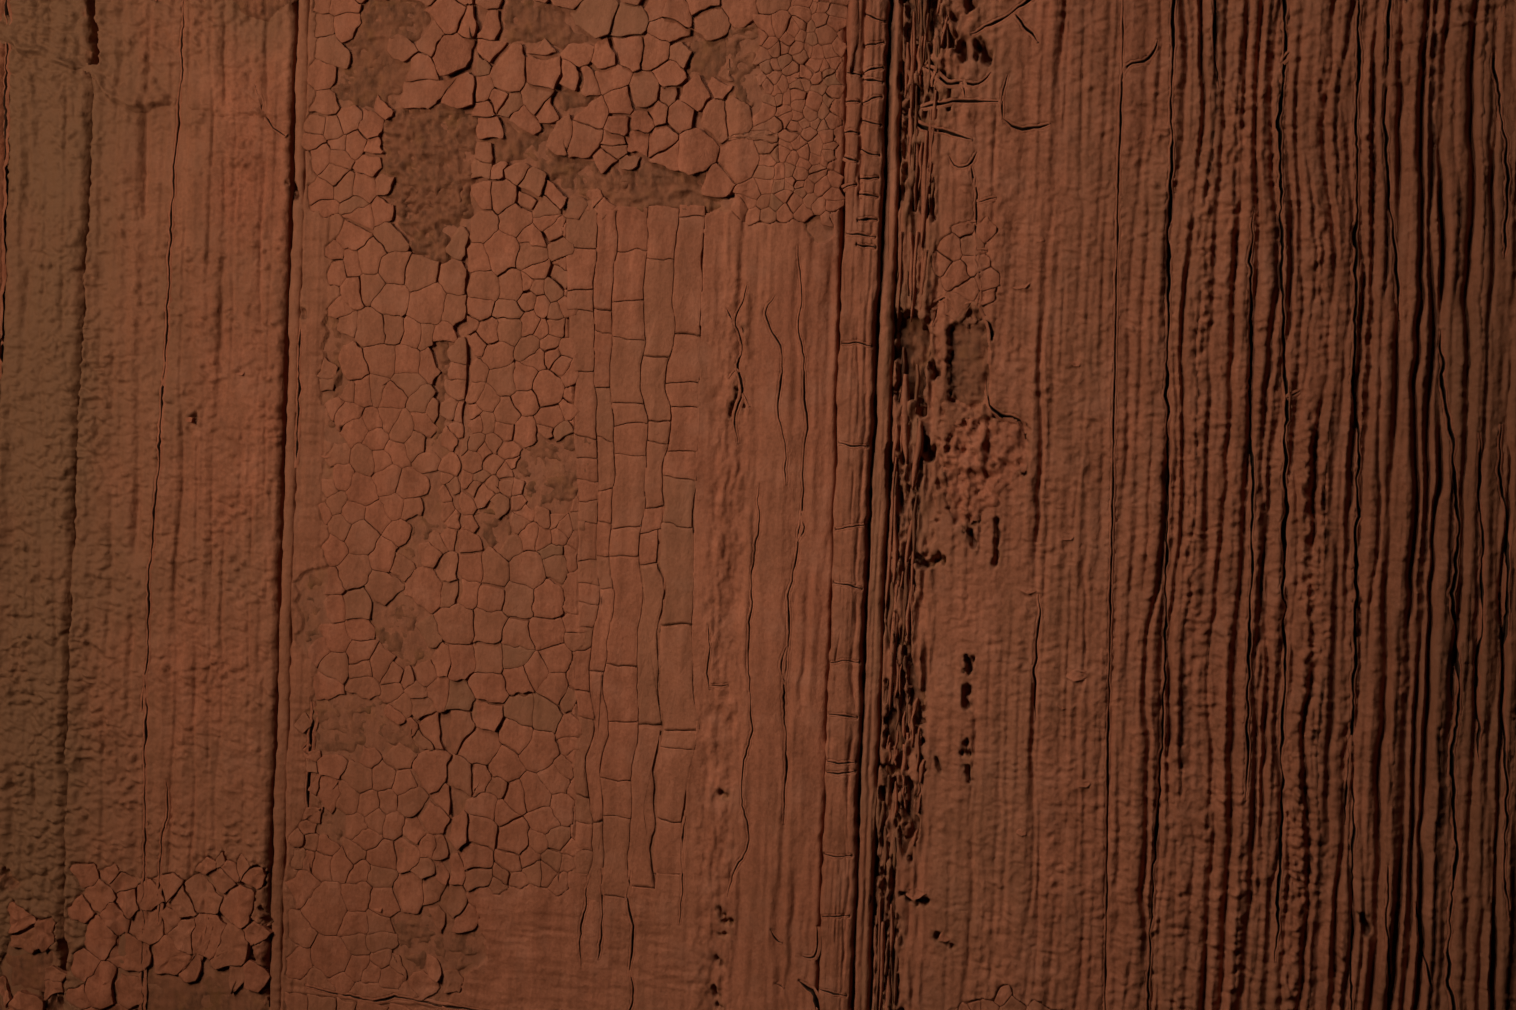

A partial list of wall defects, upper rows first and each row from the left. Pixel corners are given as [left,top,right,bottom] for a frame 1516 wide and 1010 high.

peeling [301,0,760,266]
crack [285,0,1051,1010]
spalling [943,306,1028,524]
crack [1102,0,1222,1010]
crack [1242,0,1301,962]
crack [1342,0,1513,1010]